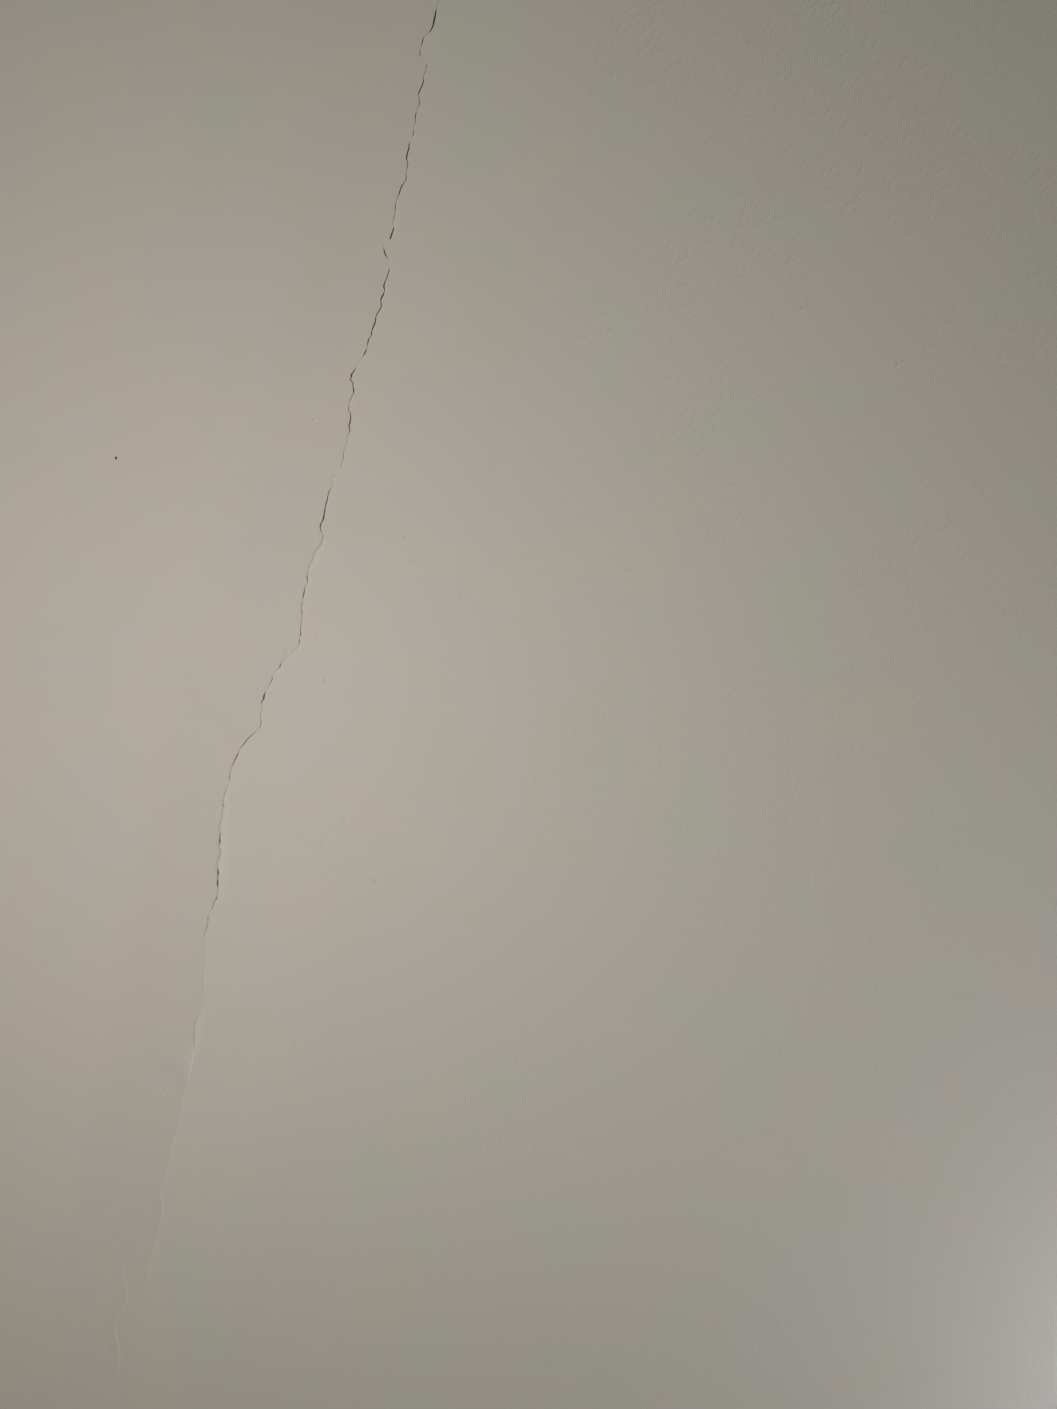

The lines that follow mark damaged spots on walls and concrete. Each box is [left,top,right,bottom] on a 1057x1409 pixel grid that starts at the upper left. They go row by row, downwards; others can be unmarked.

crack [204,4,438,953]